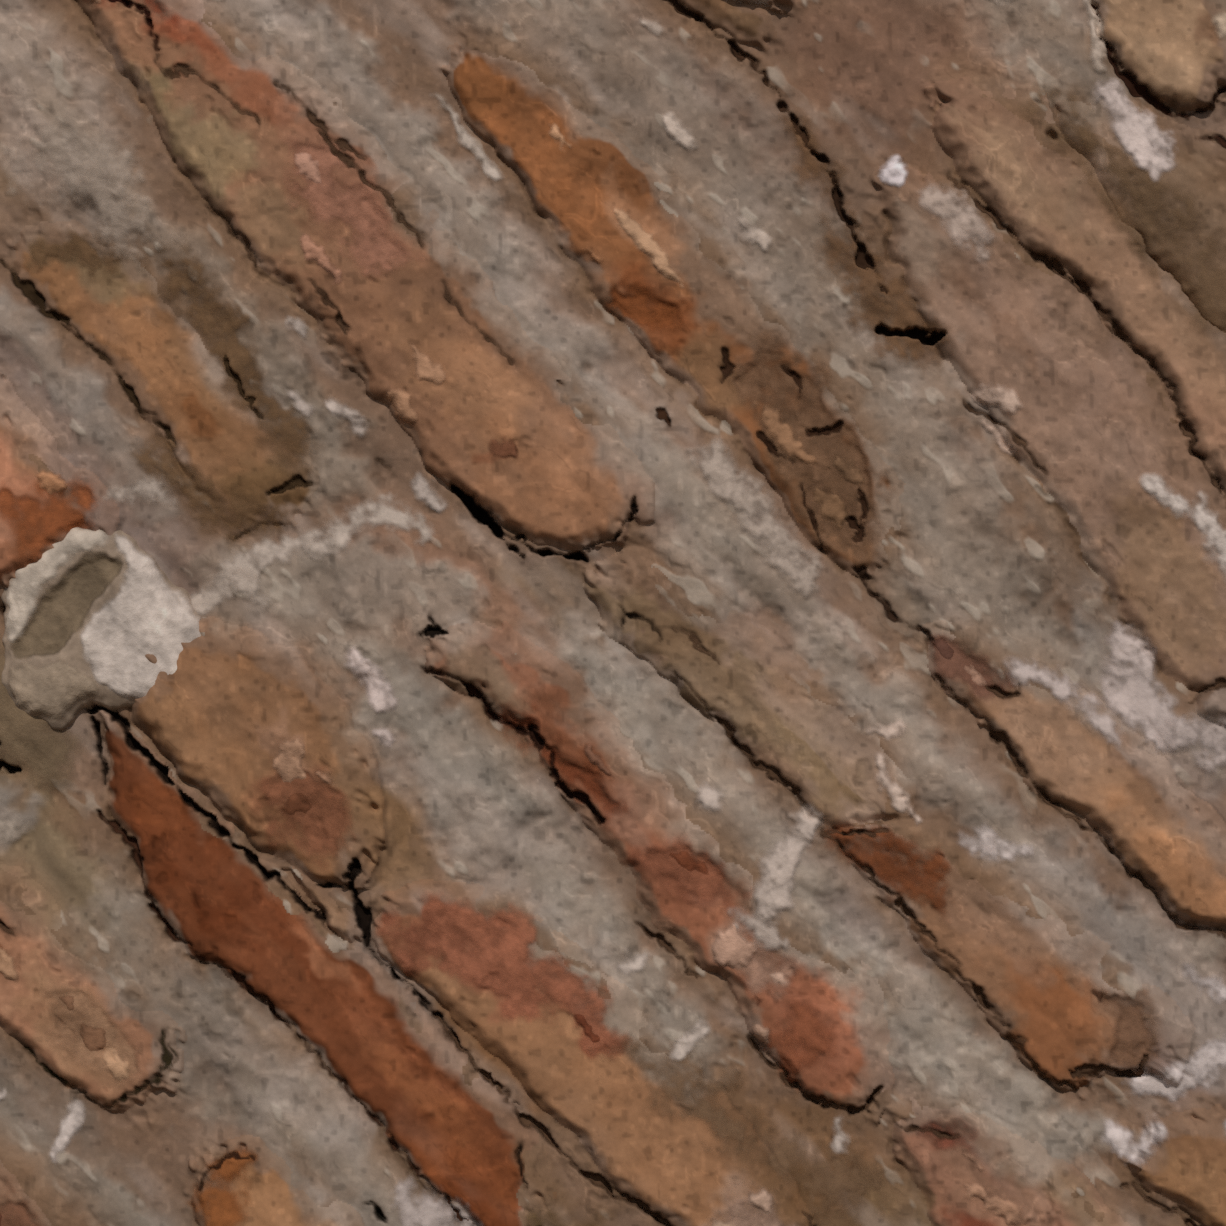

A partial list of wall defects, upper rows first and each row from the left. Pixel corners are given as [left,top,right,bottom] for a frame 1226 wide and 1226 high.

crack [109,0,260,123]
crack [666,0,704,22]
crack [274,82,422,246]
crack [728,40,887,294]
damp [1083,0,1226,331]
crack [875,326,945,345]
damp [1141,475,1226,569]
crack [0,761,21,773]
crack [423,668,605,824]
crack [89,705,671,1226]
crack [639,924,697,977]
crack [748,1036,883,1114]